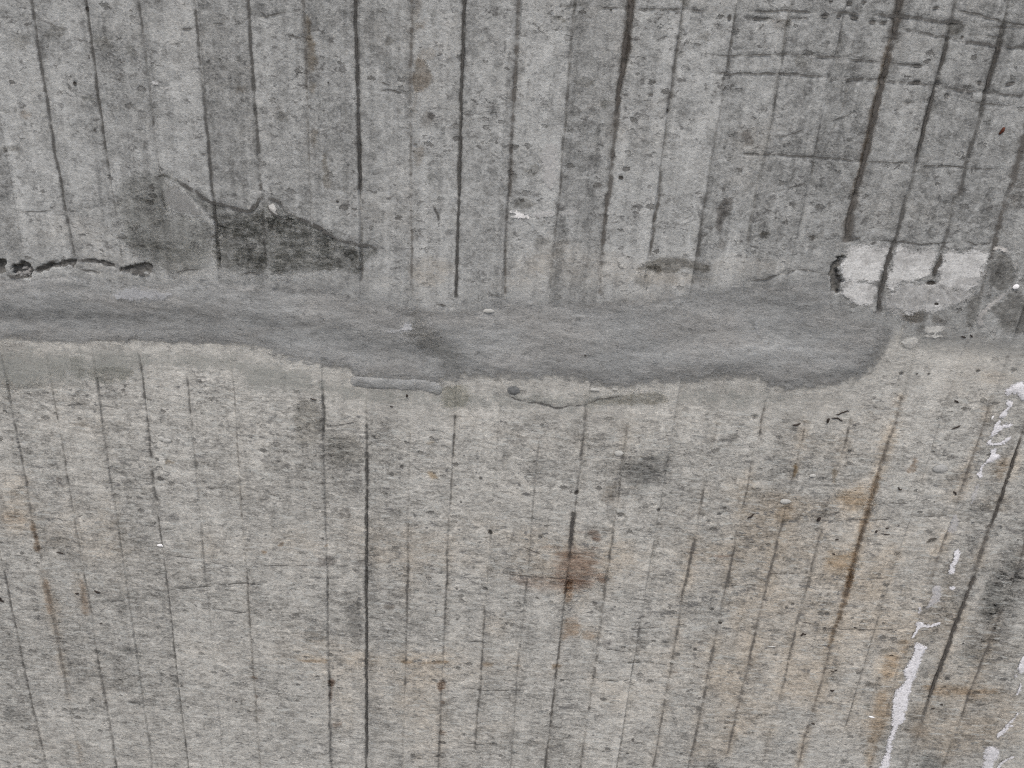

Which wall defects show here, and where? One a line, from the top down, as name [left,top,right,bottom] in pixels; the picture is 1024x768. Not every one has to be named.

leakage [177,180,377,249]
crack [8,259,201,278]
peeling [840,244,1009,315]
efflorescence [976,381,1024,478]
efflorescence [948,550,961,590]
efflorescence [879,607,940,768]
efflorescence [982,713,1019,768]